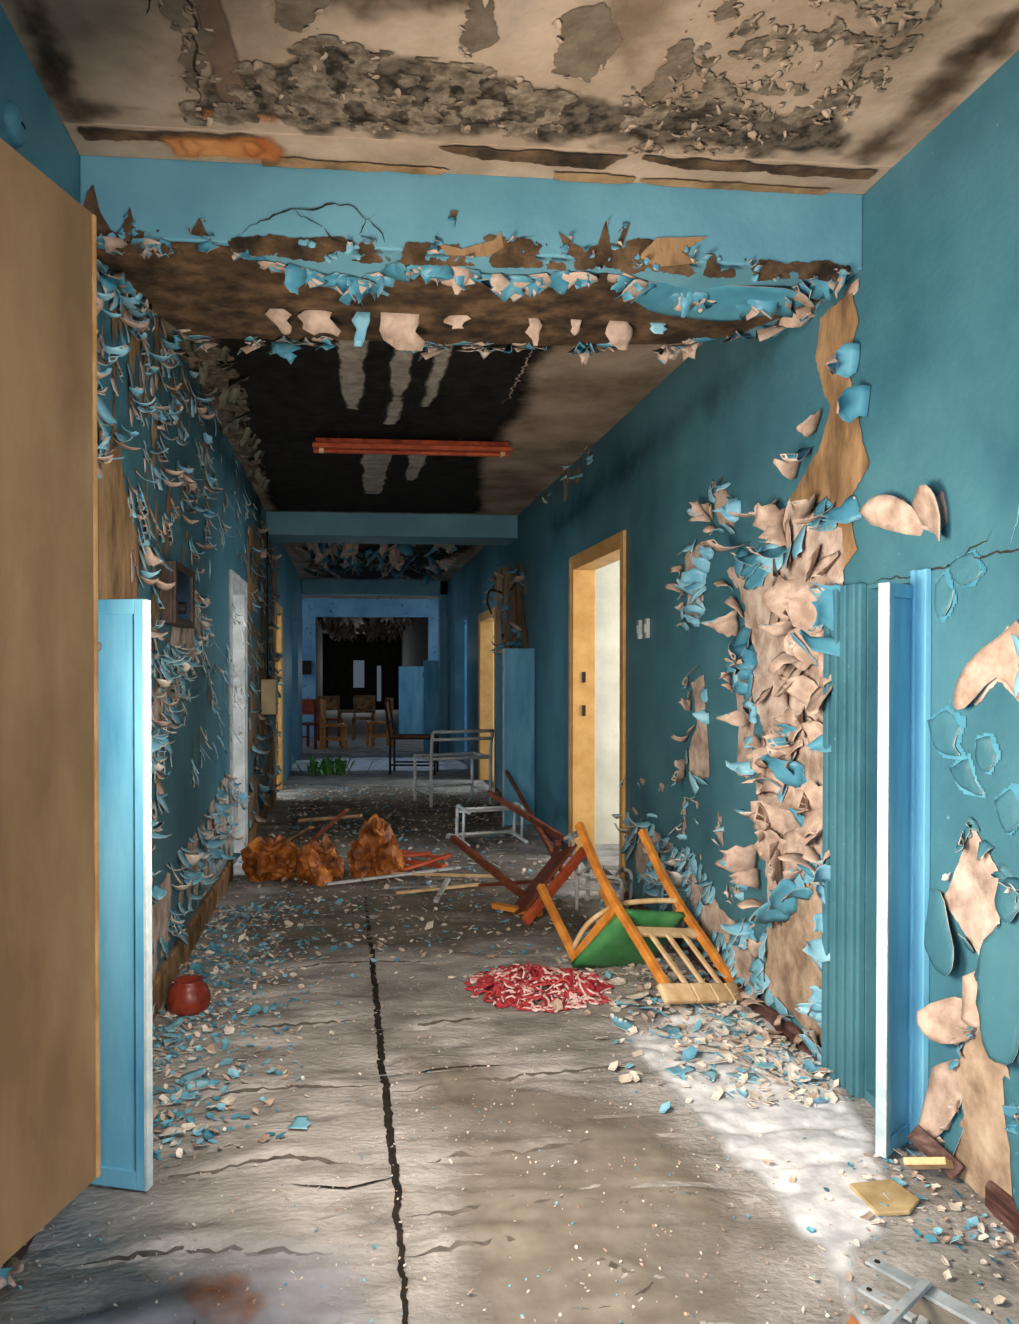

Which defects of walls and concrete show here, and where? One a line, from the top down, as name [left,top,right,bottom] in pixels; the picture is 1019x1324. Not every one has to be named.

peeling [78,0,942,195]
water stain [195,0,892,162]
water stain [911,11,1019,116]
peeling [83,185,948,1062]
crack [867,509,1019,585]
peeling [953,620,1019,710]
crack [294,882,499,1324]
peeling [917,815,1019,1213]